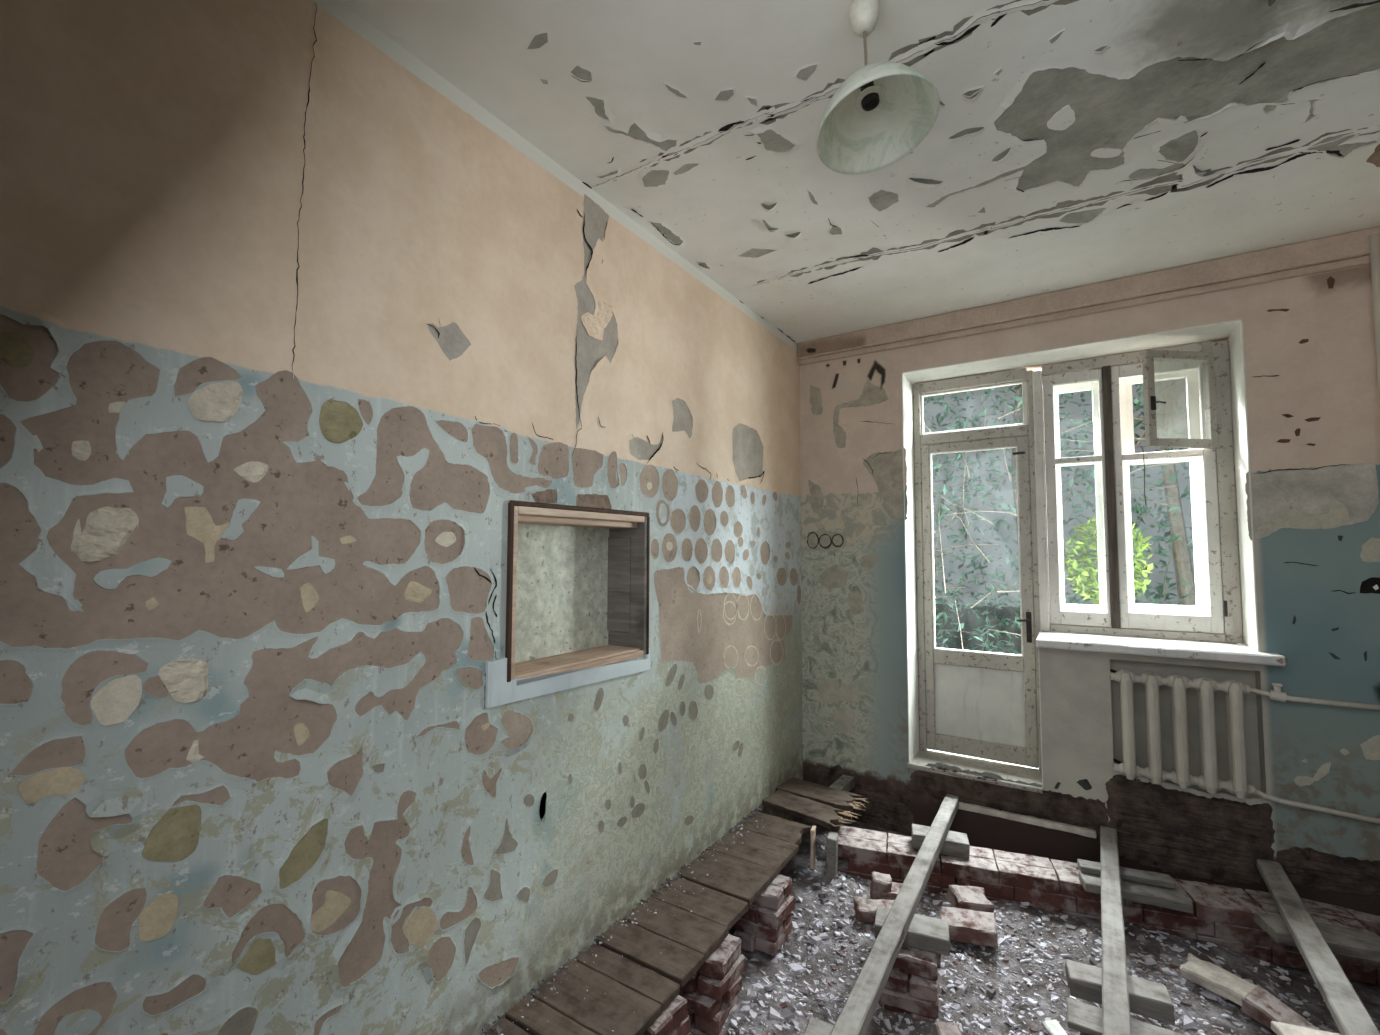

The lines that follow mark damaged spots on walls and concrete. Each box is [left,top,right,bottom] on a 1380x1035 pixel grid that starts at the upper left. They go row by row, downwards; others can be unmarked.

peeling [524,29,552,52]
crack [287,1,321,379]
peeling [862,0,1380,236]
peeling [0,62,850,1035]
peeling [806,378,908,522]
peeling [1245,413,1380,543]
spalling [1356,575,1380,596]
spalling [813,761,1380,901]